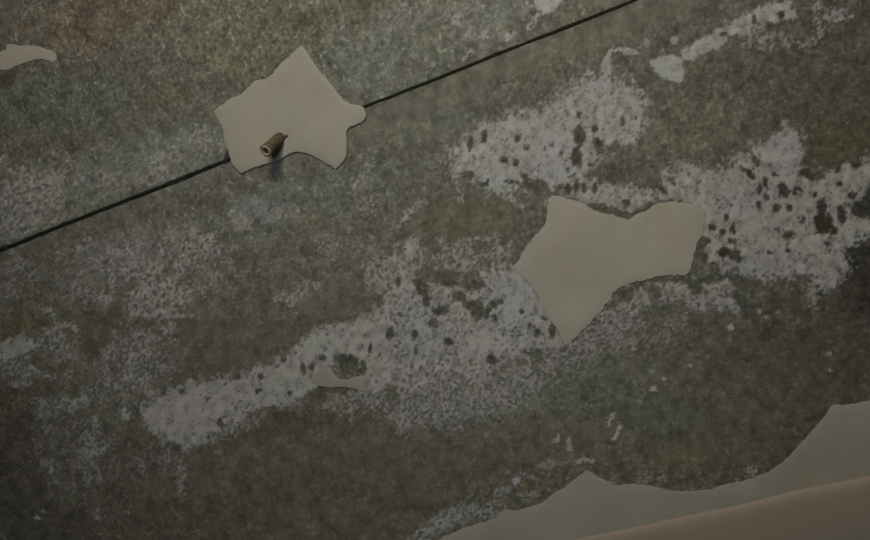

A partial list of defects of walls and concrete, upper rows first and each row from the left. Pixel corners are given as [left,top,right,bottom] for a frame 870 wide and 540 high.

flaking render [0,44,57,70]
flaking render [214,46,367,173]
crack [363,0,637,108]
water stain [443,0,564,62]
water stain [650,0,854,84]
crack [0,151,231,251]
water stain [437,46,870,319]
flaking render [514,195,706,344]
water stain [0,306,86,388]
flaking render [311,367,367,391]
water stain [31,205,688,496]
peeling [439,400,870,540]